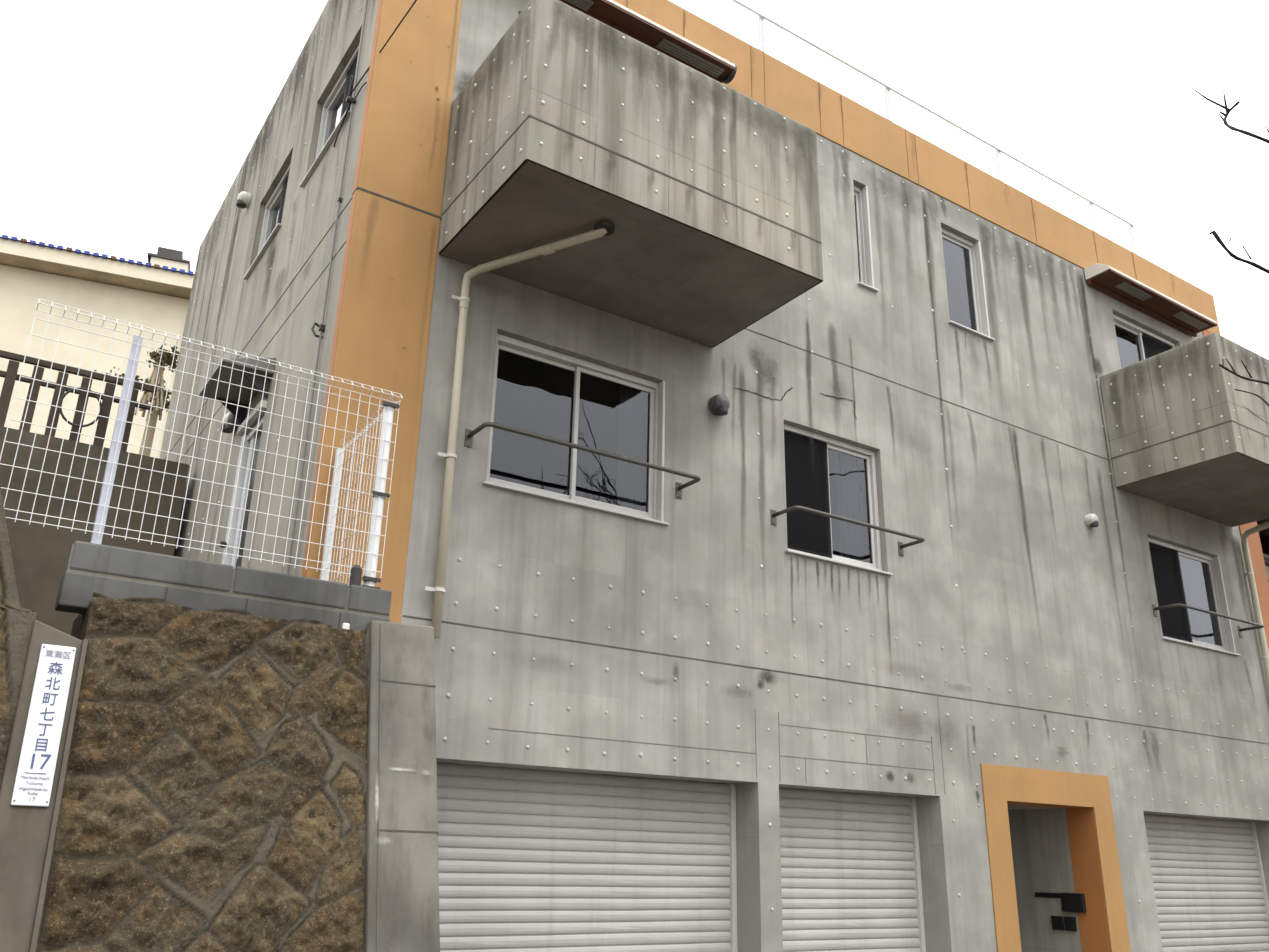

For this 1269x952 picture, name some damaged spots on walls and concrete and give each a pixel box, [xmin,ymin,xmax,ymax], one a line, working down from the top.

damp [1083,288,1115,499]